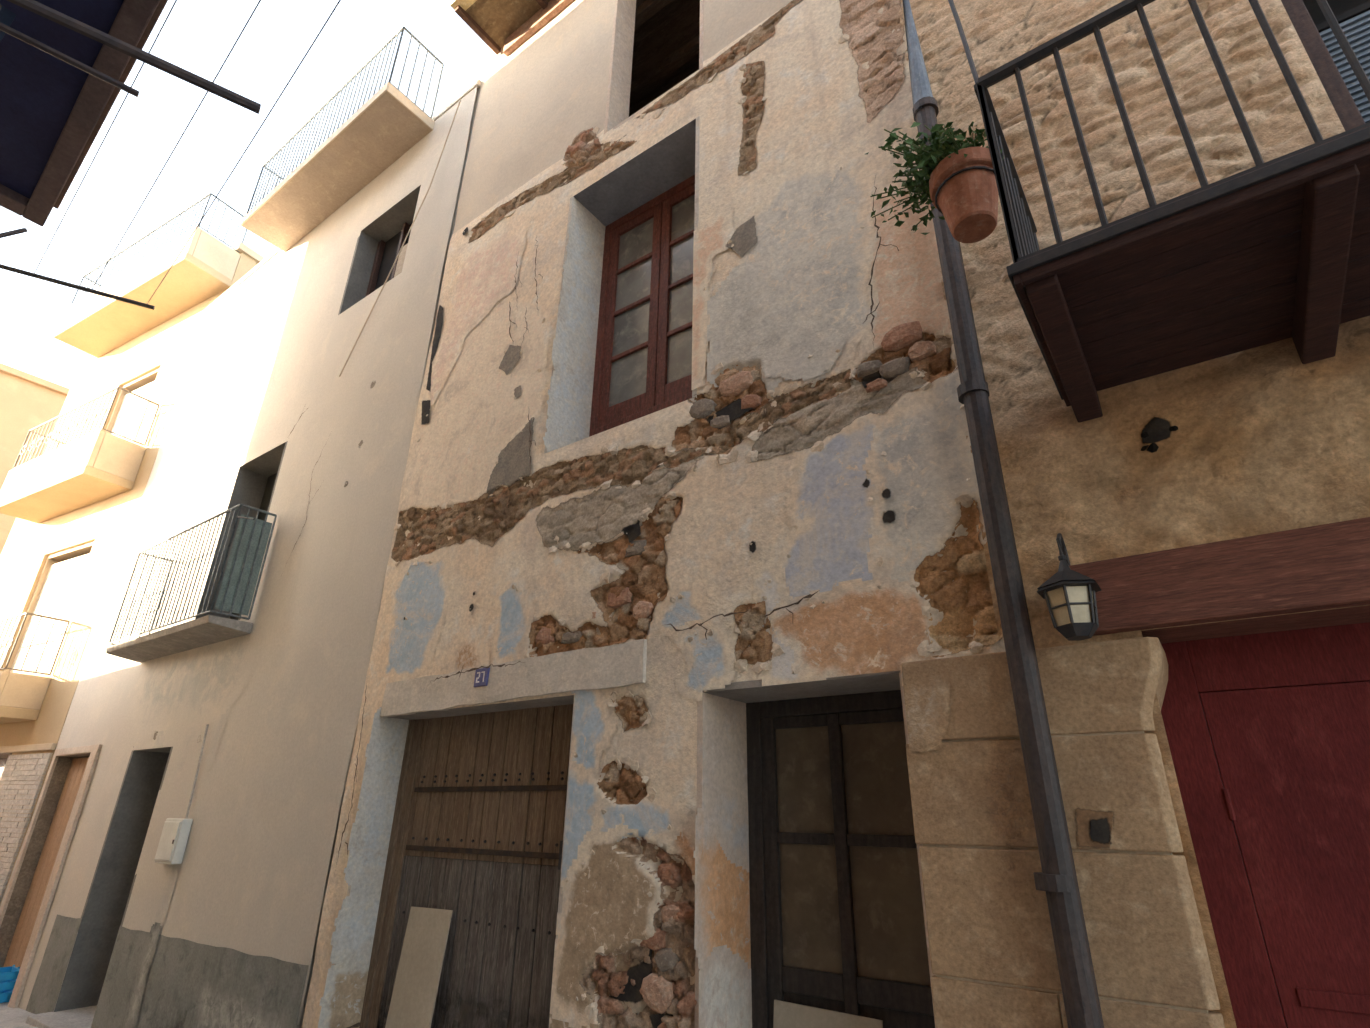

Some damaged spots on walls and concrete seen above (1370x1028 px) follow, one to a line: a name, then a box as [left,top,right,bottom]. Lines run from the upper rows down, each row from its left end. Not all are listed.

flaking render [563,127,614,168]
flaking render [737,61,767,176]
flaking render [838,0,907,123]
flaking render [522,174,956,658]
crack [667,590,820,640]
flaking render [734,579,784,674]
flaking render [910,478,1003,657]
flaking render [607,691,652,731]
flaking render [549,757,697,1028]